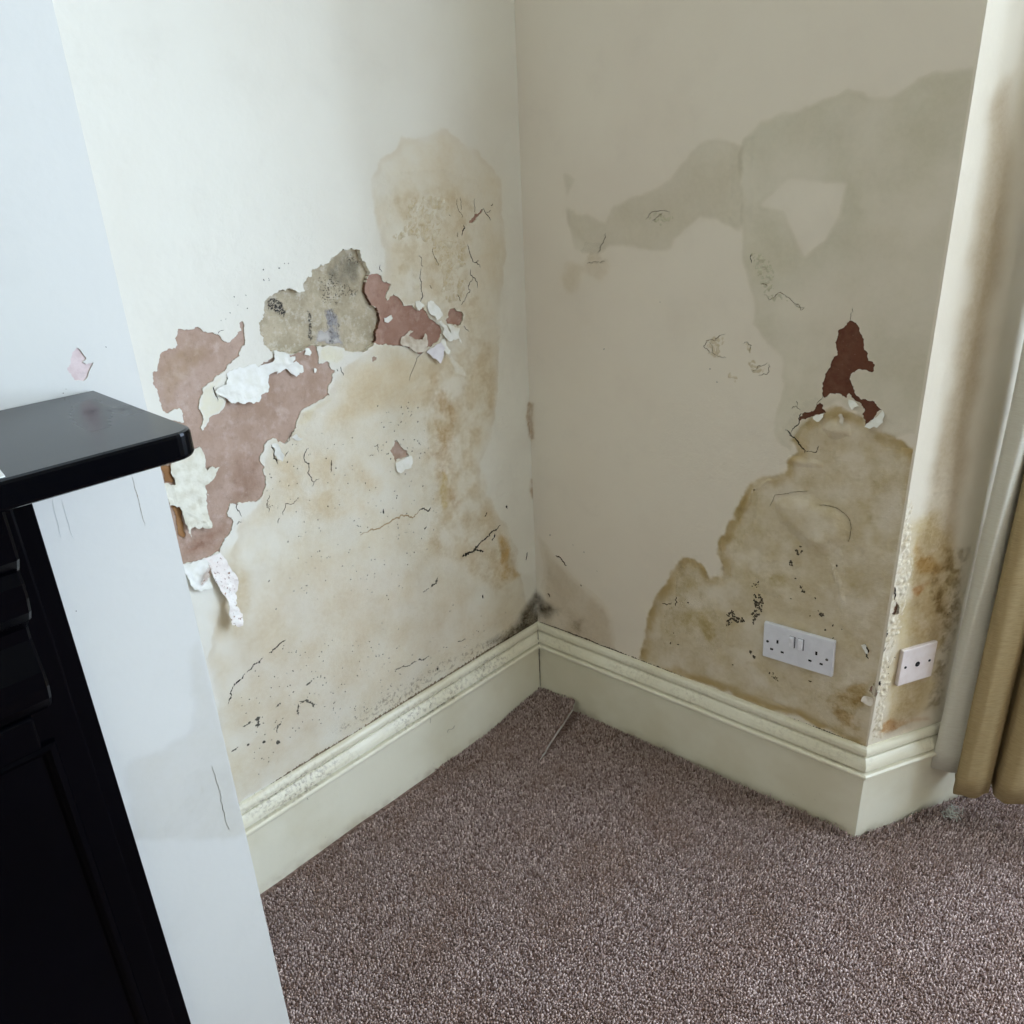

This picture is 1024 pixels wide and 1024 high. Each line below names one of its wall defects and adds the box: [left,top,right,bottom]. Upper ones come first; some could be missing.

crack [449,199,493,330]
peeling [67,348,92,381]
peeling [800,321,884,429]
peeling [153,195,467,627]
crack [361,511,419,535]
mould [508,594,550,638]
mould [726,581,764,626]
crack [228,641,284,703]
damp [231,641,346,762]